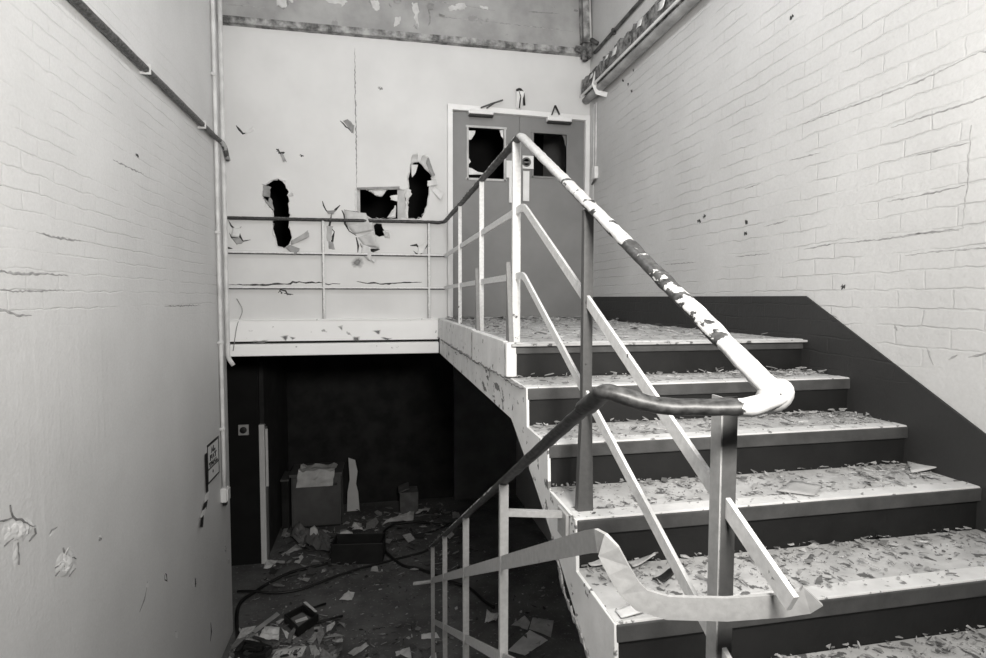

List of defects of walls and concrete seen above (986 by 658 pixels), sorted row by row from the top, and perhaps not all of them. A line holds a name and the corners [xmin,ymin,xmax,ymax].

peeling [369,0,467,29]
crack [804,51,986,124]
crack [806,96,986,256]
flaking render [0,505,37,570]
flaking render [55,547,77,577]